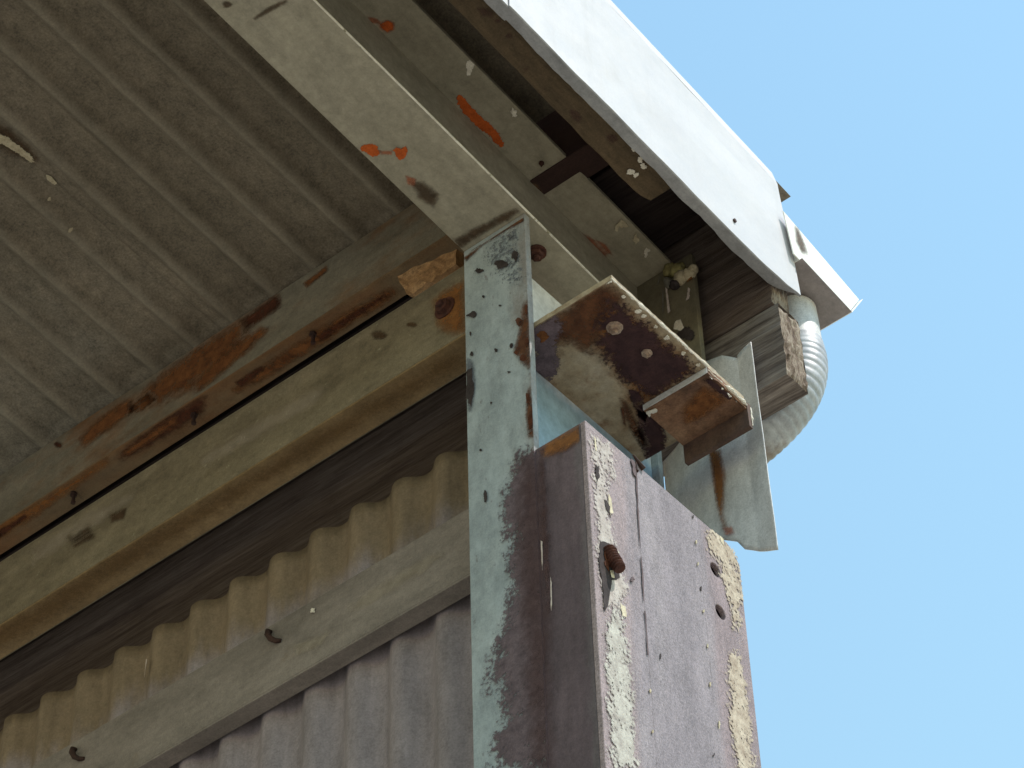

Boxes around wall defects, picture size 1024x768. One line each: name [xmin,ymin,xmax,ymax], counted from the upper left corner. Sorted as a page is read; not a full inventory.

peeling [0,126,36,163]
corrosion [81,296,280,459]
corrosion [232,290,395,391]
corrosion [514,285,731,459]
corrosion [0,461,107,538]
corrosion [709,450,732,534]
peeling [588,432,641,768]
peeling [695,530,760,768]